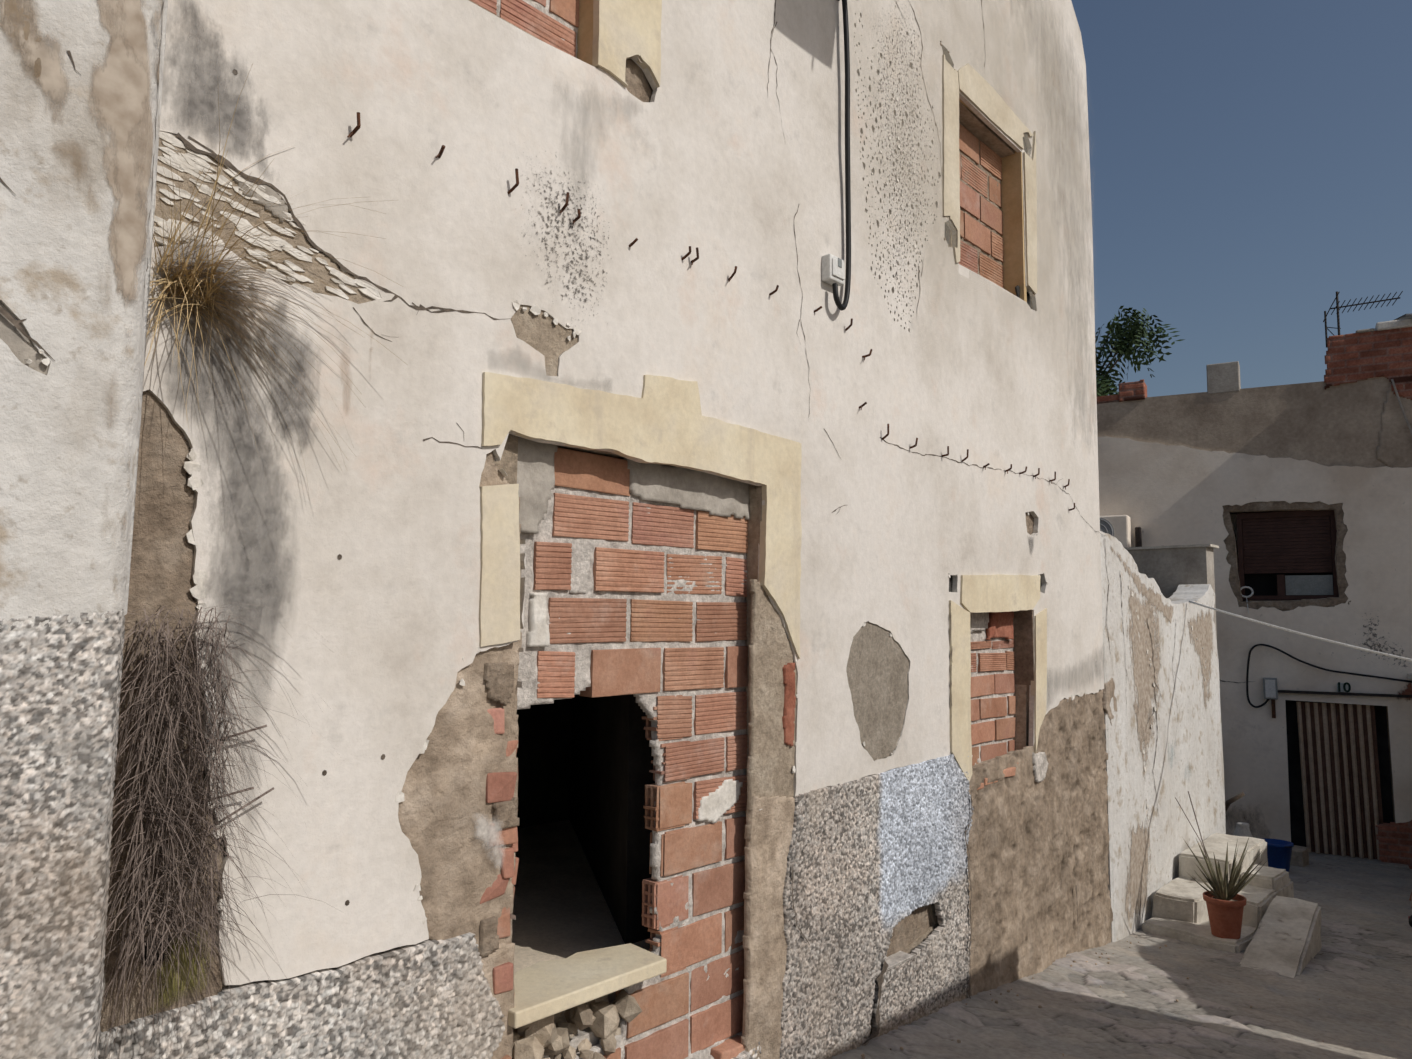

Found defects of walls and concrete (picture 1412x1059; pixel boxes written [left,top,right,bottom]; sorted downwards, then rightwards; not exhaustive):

water stain [4,0,42,82]
water stain [182,6,252,151]
water stain [164,243,309,683]
peeling [90,0,387,304]
crack [143,1,511,342]
peeling [510,300,582,376]
water stain [521,151,609,330]
water stain [867,0,931,298]
peeling [100,390,230,1032]
spalling [395,632,522,1059]
spalling [846,621,909,761]
spalling [966,678,1151,996]